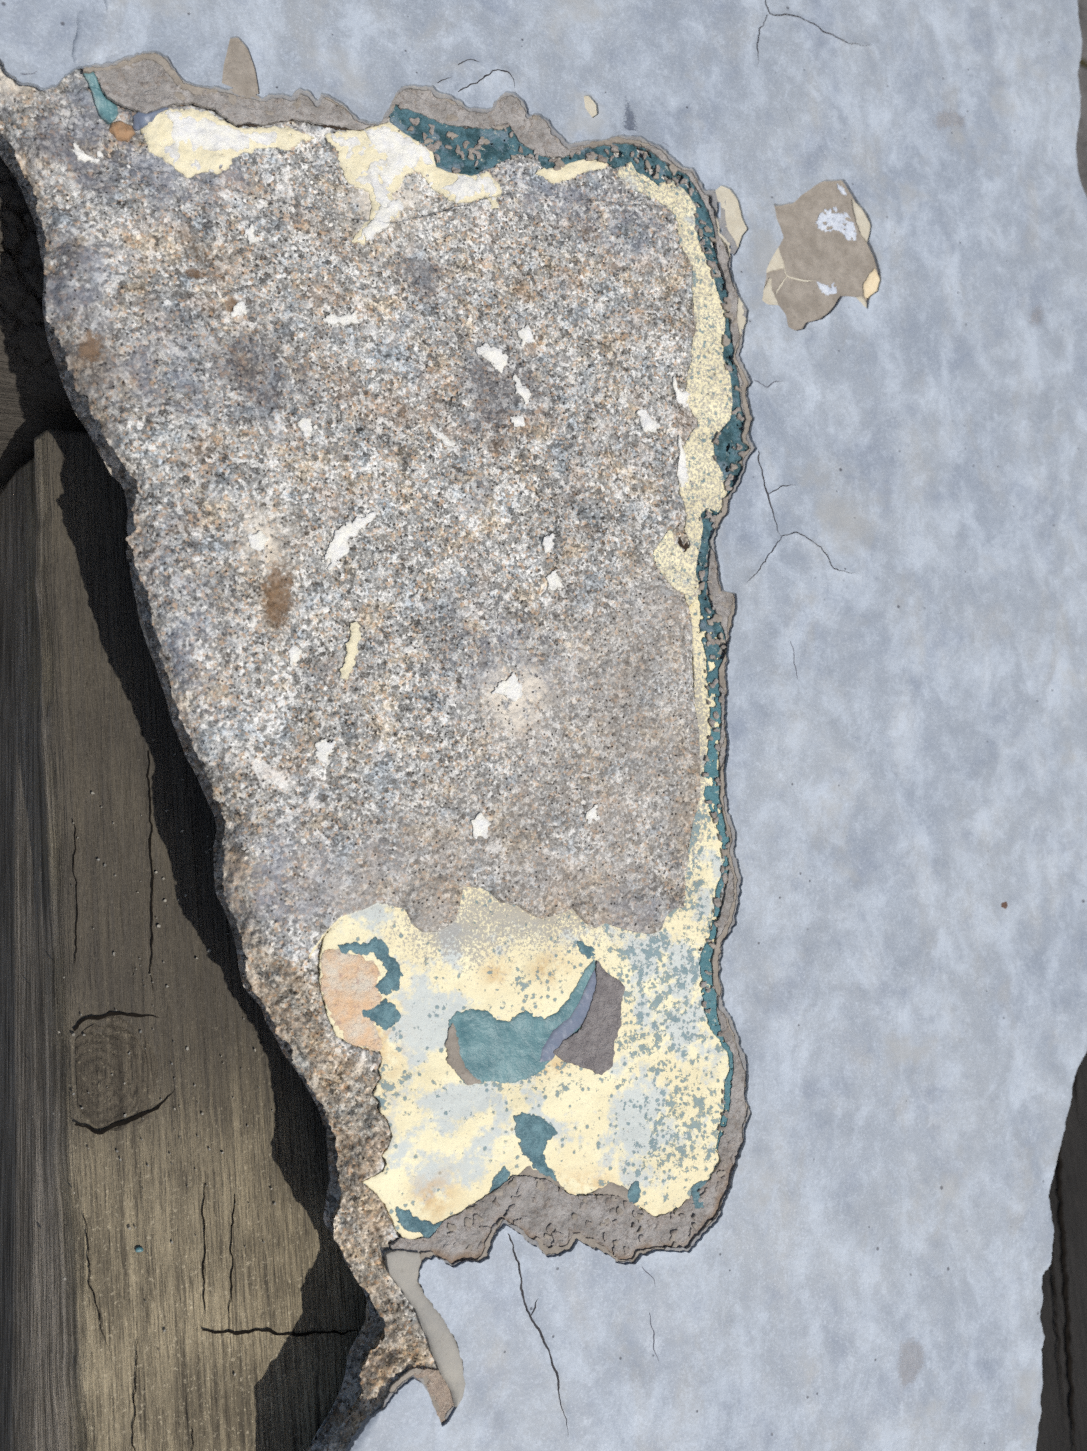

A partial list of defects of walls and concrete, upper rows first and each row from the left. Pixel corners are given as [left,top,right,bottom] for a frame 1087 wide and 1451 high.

crack [757,0,867,59]
peeling [762,180,880,331]
crack [753,438,858,576]
spalling [0,38,755,1451]
crack [508,1233,568,1429]